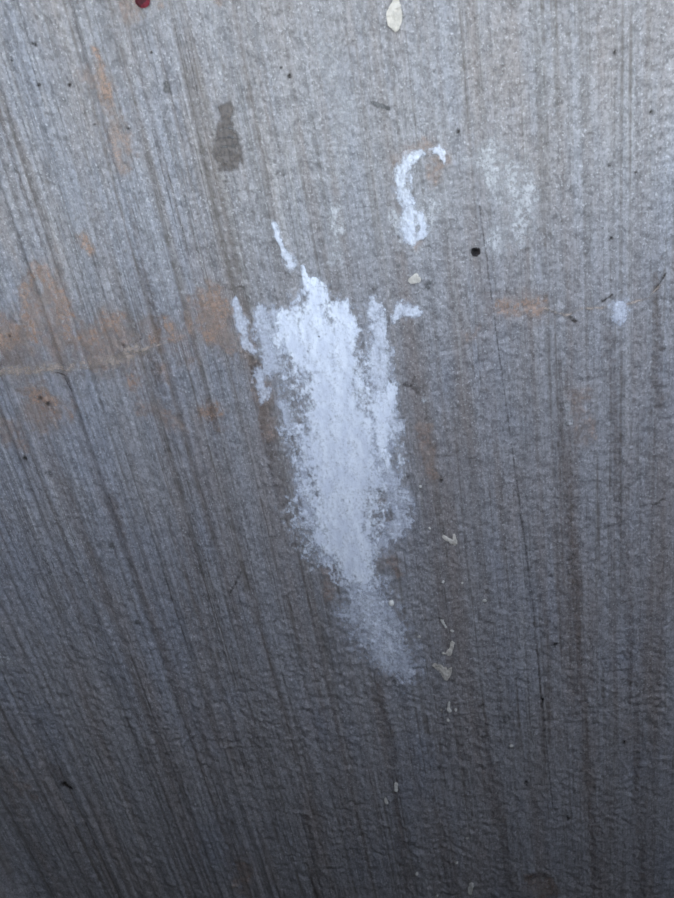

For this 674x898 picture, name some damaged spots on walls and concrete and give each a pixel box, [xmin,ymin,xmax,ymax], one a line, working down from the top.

damp [388,145,446,255]
crack [0,338,166,389]
damp [232,222,425,684]